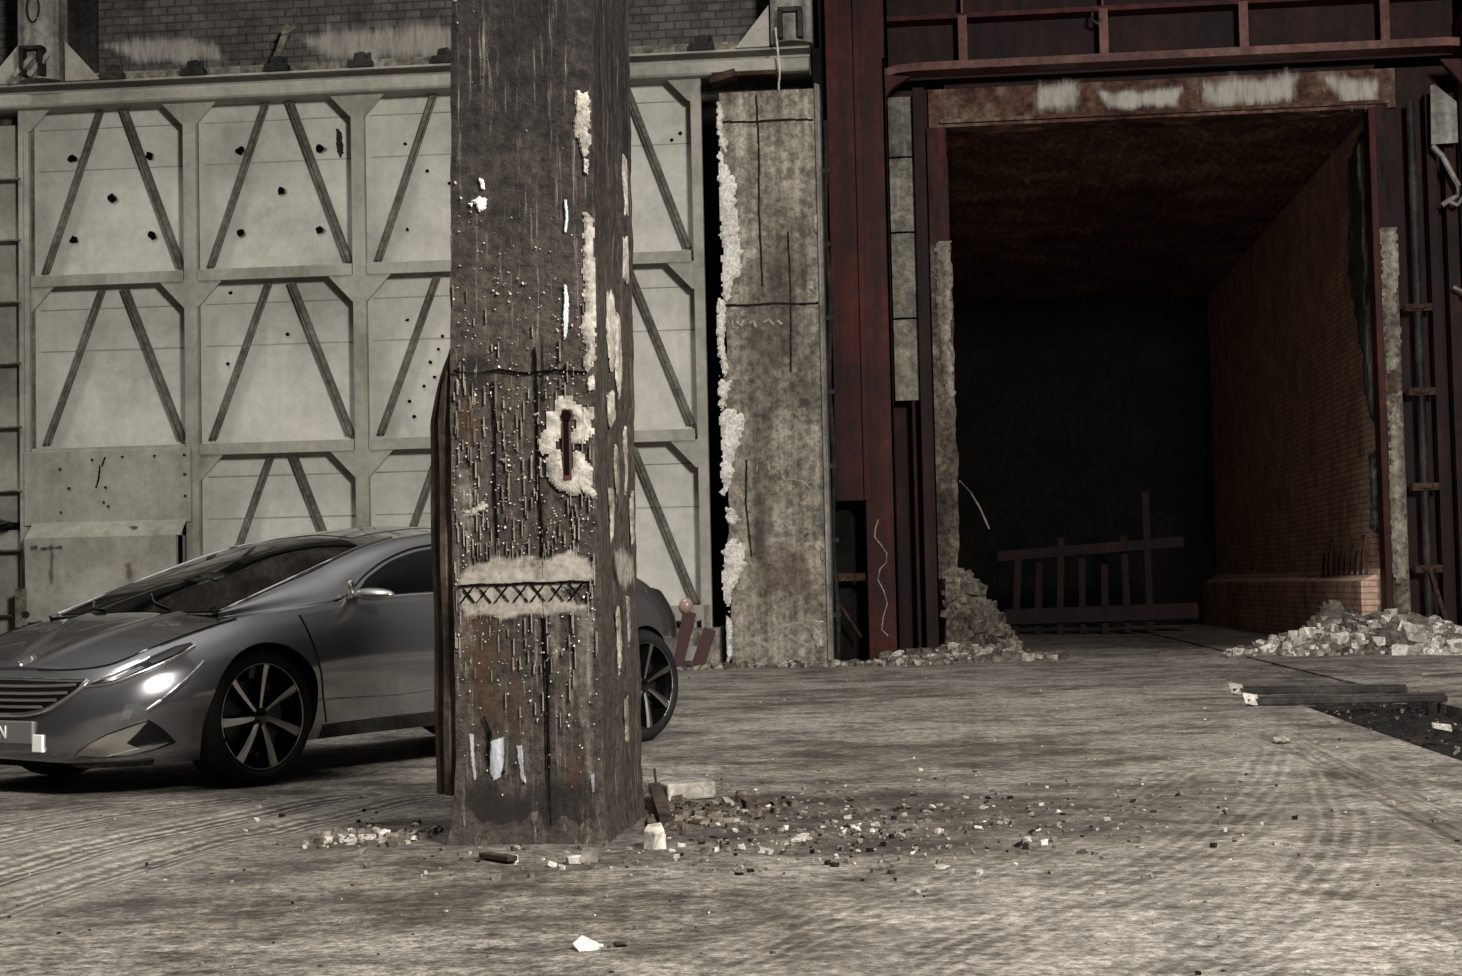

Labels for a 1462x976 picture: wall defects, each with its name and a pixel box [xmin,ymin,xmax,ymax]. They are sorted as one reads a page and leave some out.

peeling [1038,82,1076,109]
peeling [1100,87,1182,109]
peeling [1203,73,1295,106]
peeling [1326,76,1378,101]
spalling [716,101,824,663]
spalling [533,200,635,676]
peeling [462,501,488,517]
spalling [460,550,592,618]